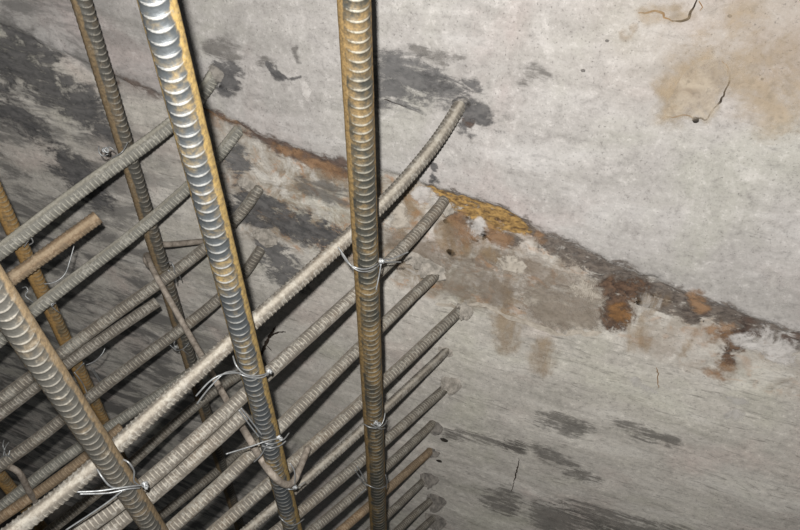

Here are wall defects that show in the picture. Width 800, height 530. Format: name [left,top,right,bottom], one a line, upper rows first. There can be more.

crack [638,0,703,22]
leakage [373,45,493,137]
crack [667,61,731,121]
rust [203,108,348,178]
rust [427,185,543,247]
spalling [0,0,603,530]
rust [597,276,651,331]
rust [706,317,760,380]